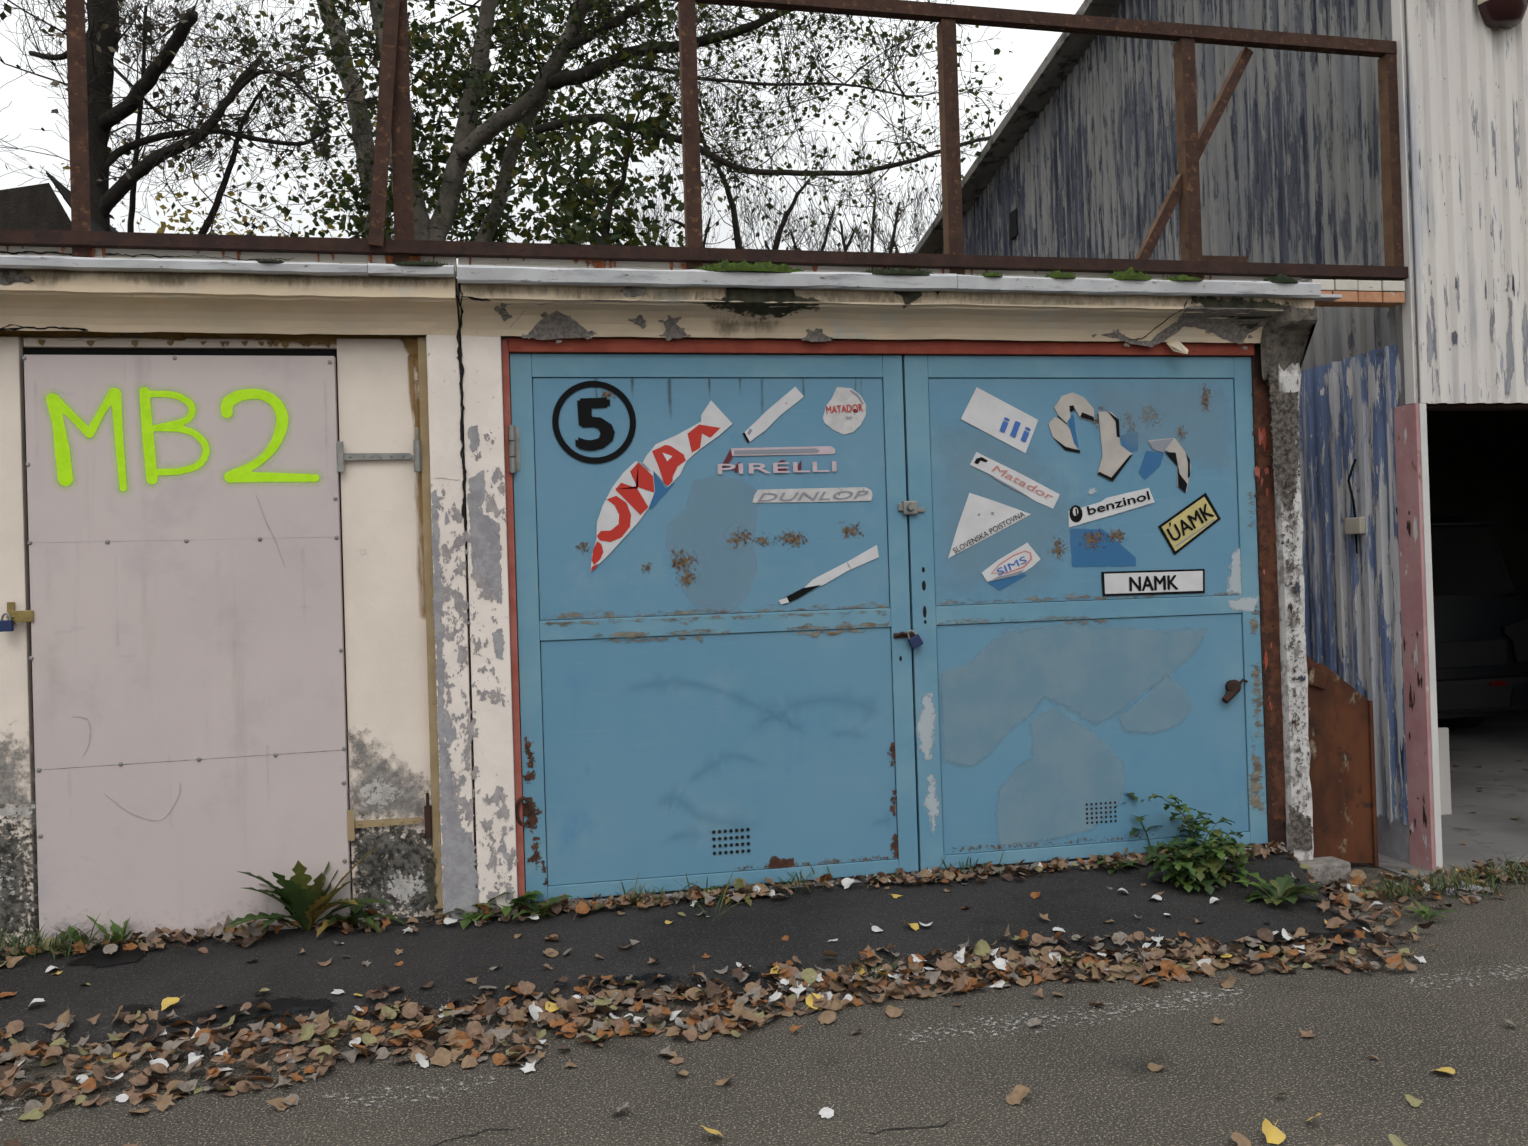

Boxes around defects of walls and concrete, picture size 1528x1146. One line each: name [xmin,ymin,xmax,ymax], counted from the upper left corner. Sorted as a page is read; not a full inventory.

spalling [522,311,596,343]
crack [443,283,691,528]
spalling [1092,303,1284,354]
peeling [1481,253,1528,395]
water stain [0,736,39,948]
water stain [348,732,438,920]
peeling [431,425,518,919]
corrosion [523,737,548,887]
corrosion [547,619,646,638]
peeling [1254,401,1309,817]
corrosion [1306,654,1379,867]
peeling [1319,260,1464,847]